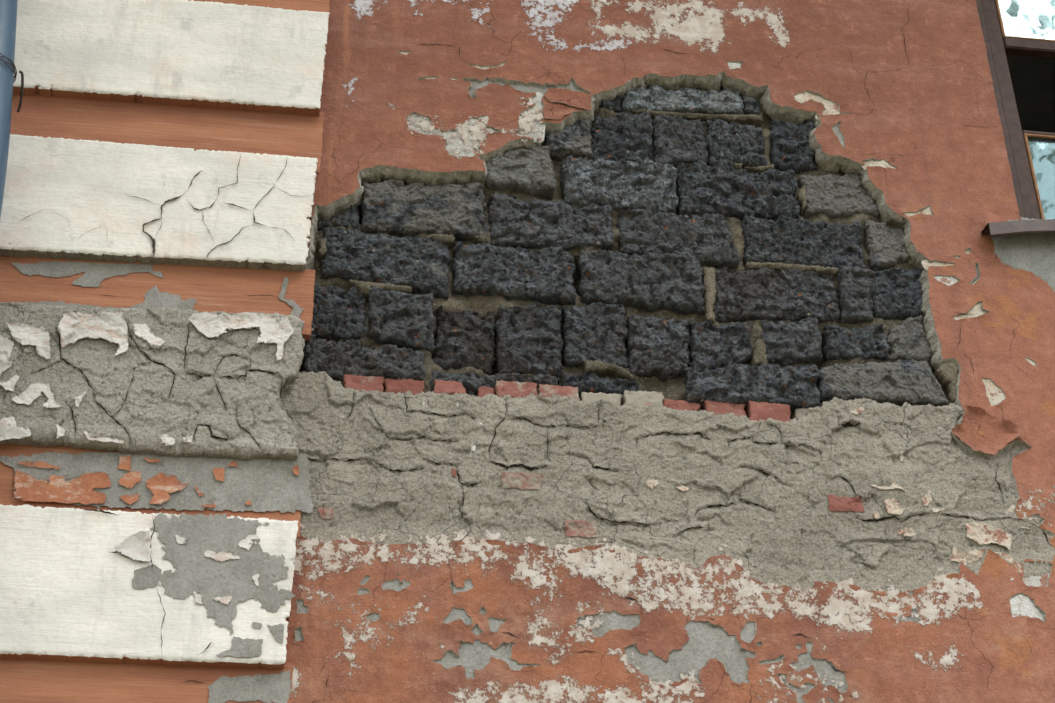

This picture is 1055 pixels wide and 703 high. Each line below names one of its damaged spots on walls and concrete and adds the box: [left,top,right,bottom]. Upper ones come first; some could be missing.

crack [127,154,299,260]
crack [39,322,298,447]
spalling [0,80,1055,637]
crack [308,389,600,591]
crack [585,458,776,535]
crack [636,424,822,486]
crack [841,470,1051,567]
peeling [216,636,263,658]
peeling [252,622,284,644]
peeling [434,608,537,679]
peeling [625,621,846,703]